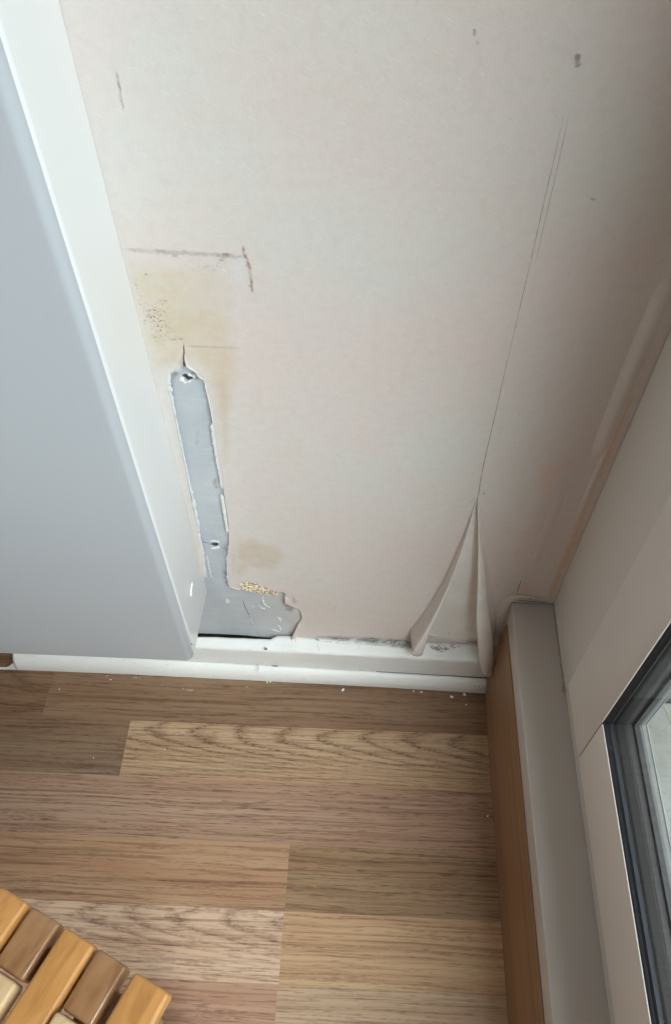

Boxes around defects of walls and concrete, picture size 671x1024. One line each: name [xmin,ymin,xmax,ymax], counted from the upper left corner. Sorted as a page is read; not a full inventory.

damp [121,248,267,507]
peeling [167,366,308,650]